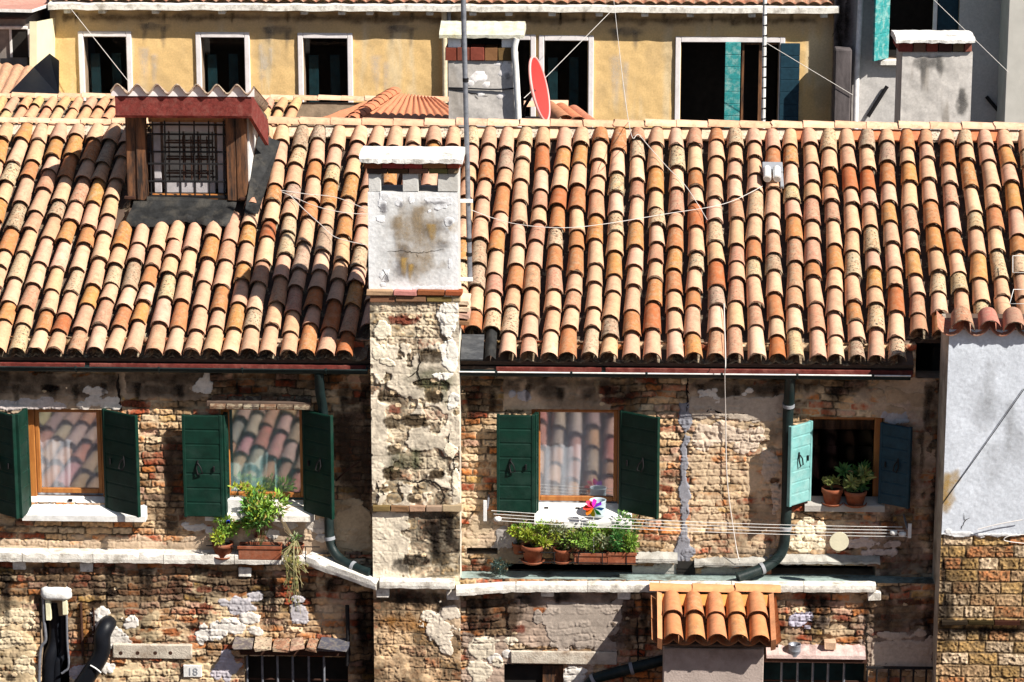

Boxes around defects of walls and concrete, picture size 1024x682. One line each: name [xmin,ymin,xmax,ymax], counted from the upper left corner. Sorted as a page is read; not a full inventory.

flaking render [468,61,513,99]
damp [393,208,434,271]
flaking render [372,314,419,367]
flaking render [400,285,459,410]
flaking render [0,385,143,411]
spalling [378,390,428,428]
spalling [383,443,401,479]
flaking render [430,442,460,496]
flaking render [688,387,784,515]
peeling [123,614,141,644]
flaking render [162,583,263,645]
flaking render [419,600,460,656]